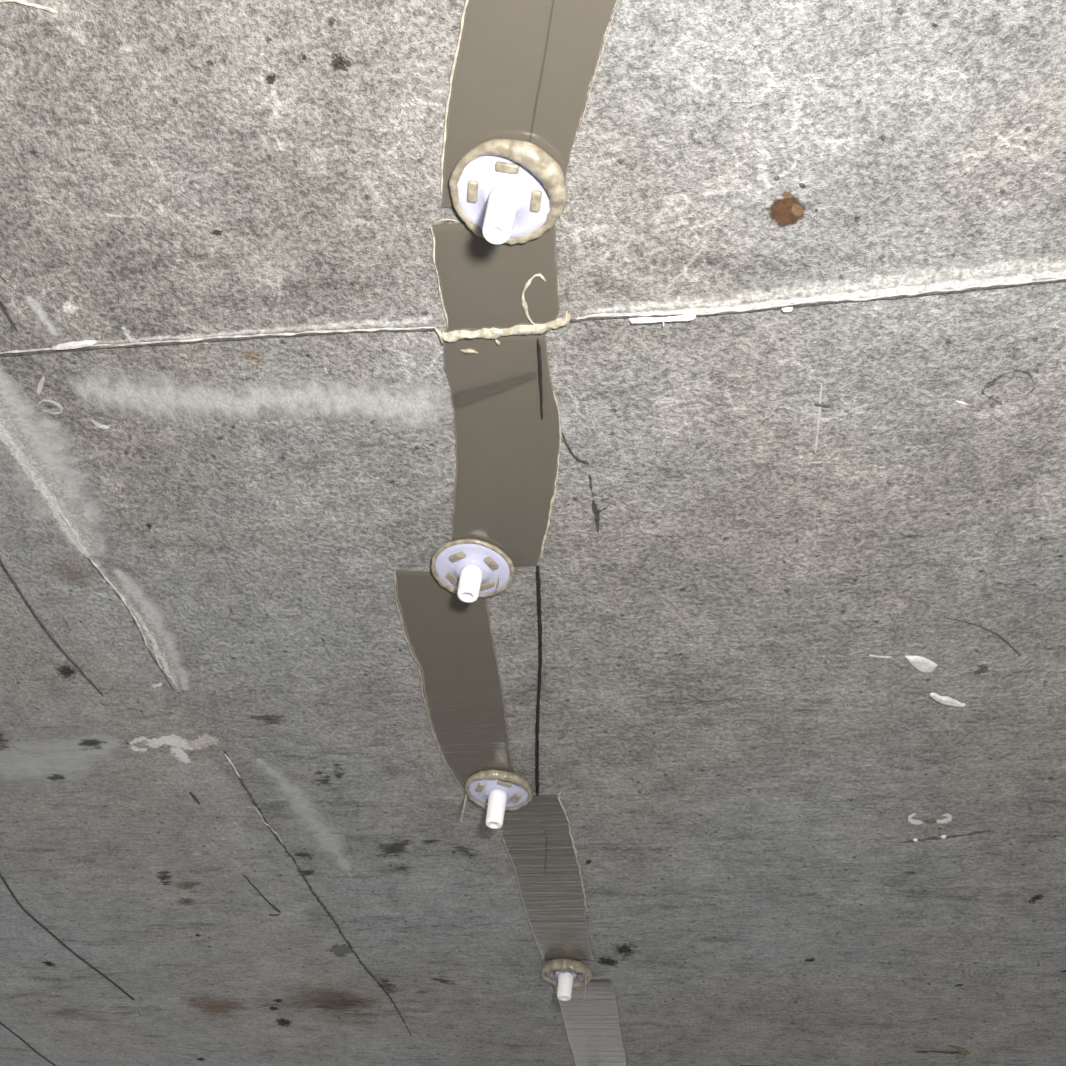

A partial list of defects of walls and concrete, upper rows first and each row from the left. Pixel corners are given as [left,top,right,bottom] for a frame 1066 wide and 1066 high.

rust [769,176,818,227]
water stain [37,376,63,414]
crack [537,338,608,532]
crack [0,559,104,696]
crack [534,566,542,796]
peeling [129,731,220,763]
crack [243,874,281,916]
crack [0,873,135,1000]
crack [0,1022,56,1066]